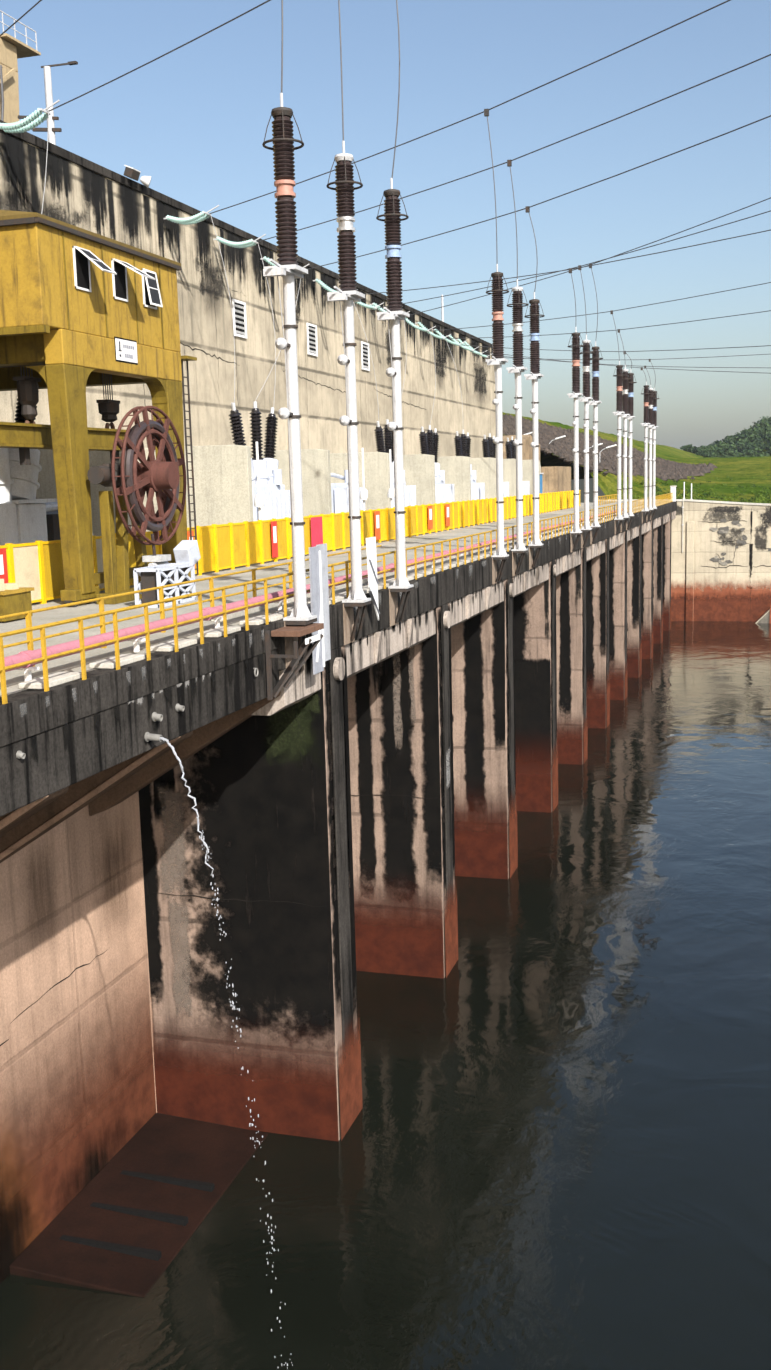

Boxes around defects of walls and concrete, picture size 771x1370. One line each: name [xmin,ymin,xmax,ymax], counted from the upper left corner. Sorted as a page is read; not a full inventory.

water stain [0,131,275,322]
water stain [294,262,337,323]
water stain [353,288,493,393]
water stain [703,506,771,588]
water stain [138,504,682,1046]